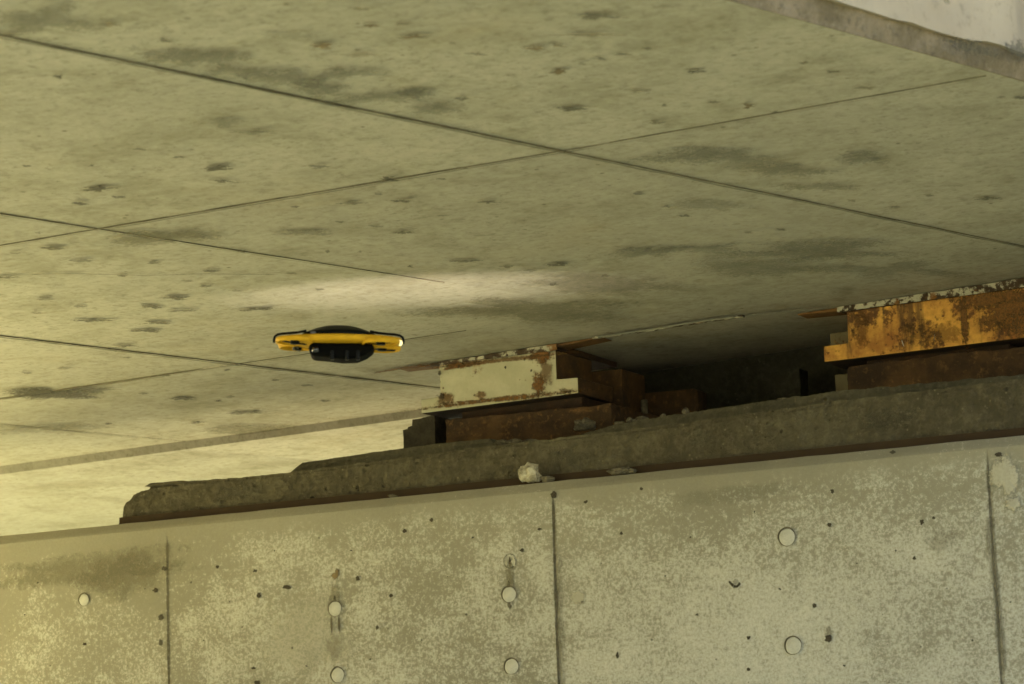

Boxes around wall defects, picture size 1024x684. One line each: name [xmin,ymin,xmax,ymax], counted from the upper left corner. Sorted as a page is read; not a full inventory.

rust [951,288,1024,347]
rust [374,351,588,410]